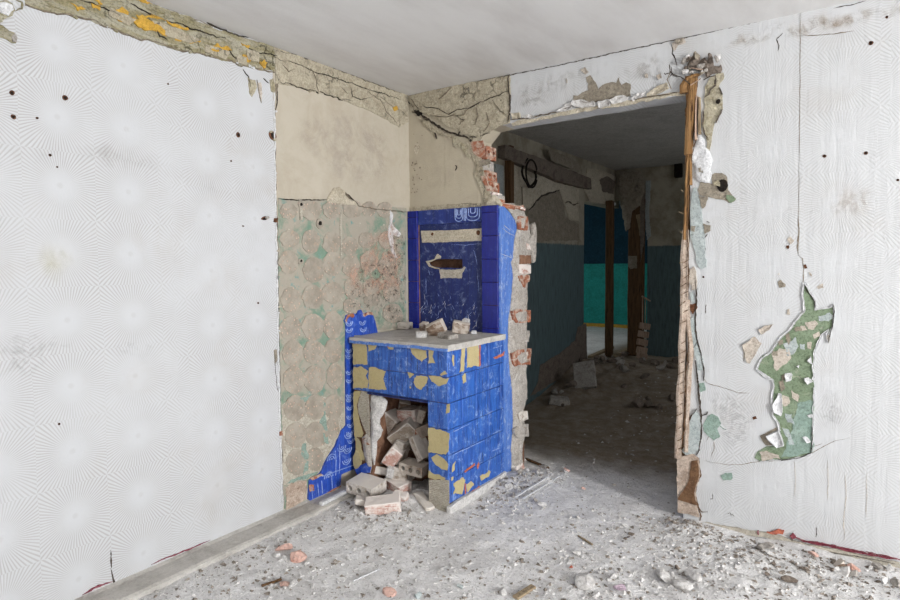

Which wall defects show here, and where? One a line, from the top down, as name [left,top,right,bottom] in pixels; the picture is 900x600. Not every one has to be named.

crack [162,7,733,170]
peeling [0,0,484,510]
peeling [510,38,736,456]
crack [796,215,804,281]
peeling [742,264,835,462]